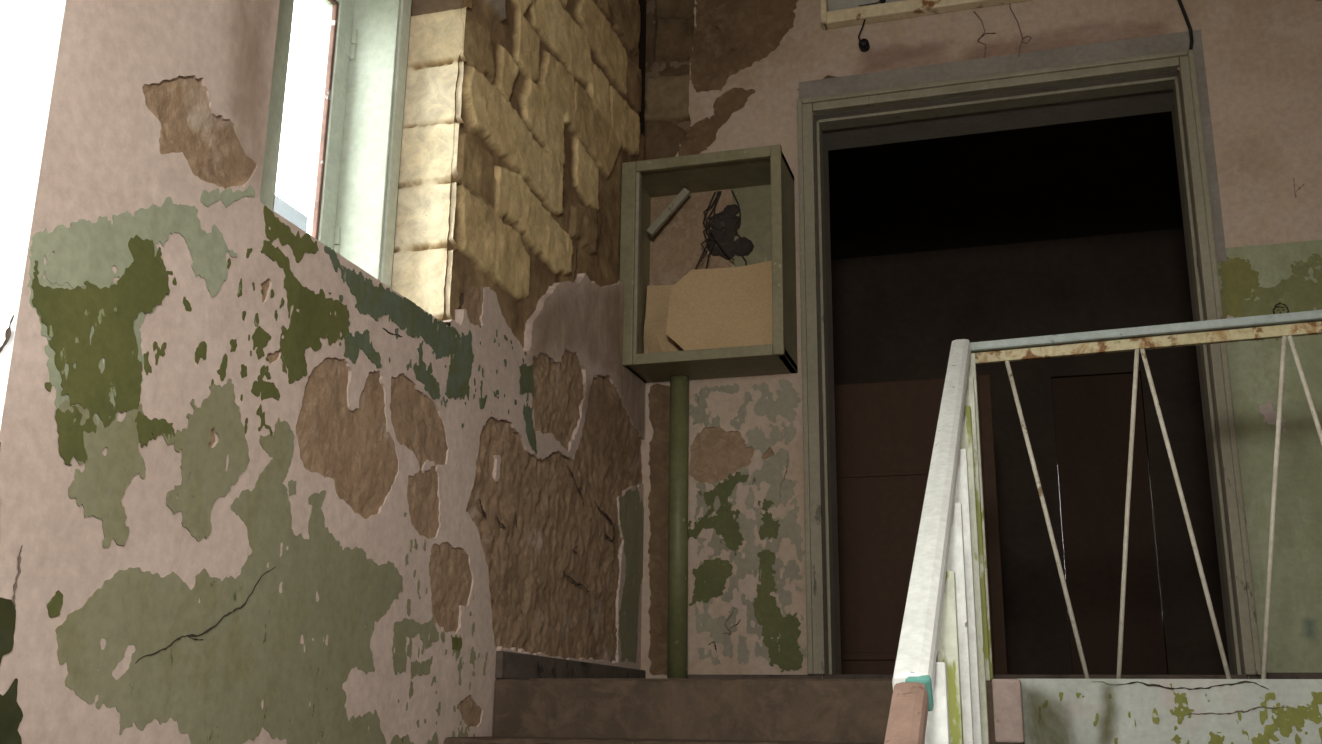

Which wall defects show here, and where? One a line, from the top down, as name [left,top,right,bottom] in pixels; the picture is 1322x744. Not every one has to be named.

peeling [1218,253,1322,319]
flaking render [27,0,807,744]
peeling [0,597,16,665]
crack [136,567,275,662]
peeling [0,678,23,744]
peeling [1152,683,1194,744]
peeling [1208,692,1322,744]